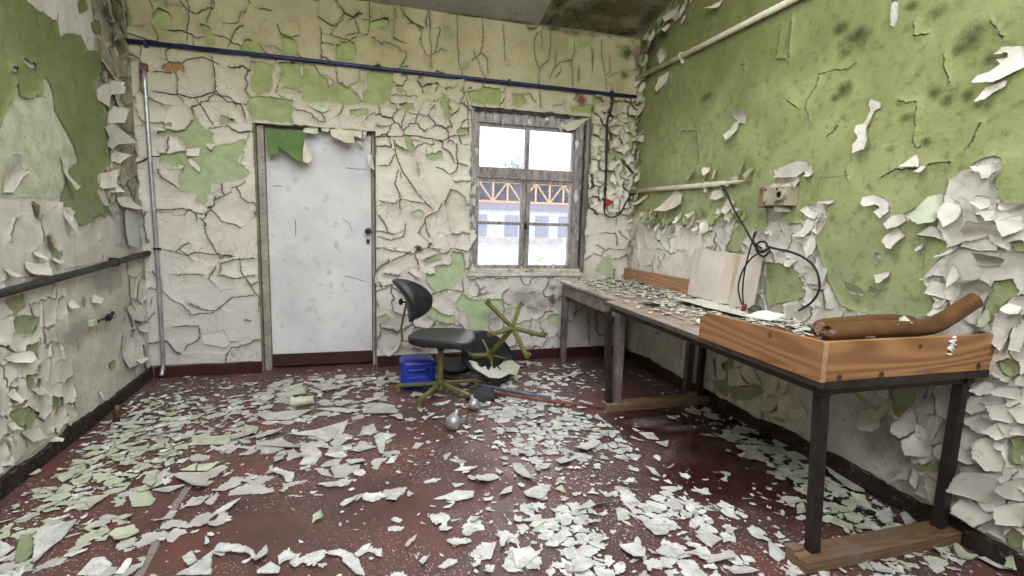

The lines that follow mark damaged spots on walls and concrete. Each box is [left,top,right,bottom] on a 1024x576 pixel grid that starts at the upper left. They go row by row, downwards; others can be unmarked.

crack [153,35,246,124]
peeling [0,0,759,375]
crack [373,25,505,285]
crack [533,32,606,86]
crack [881,101,980,178]
crack [162,208,253,348]
peeling [446,0,1024,549]
peeling [0,280,104,475]
peeling [1004,555,1017,570]